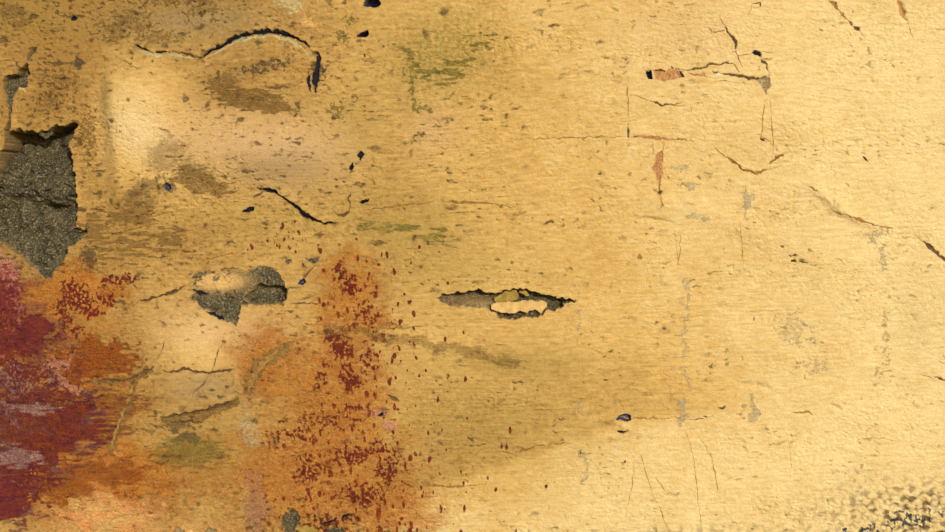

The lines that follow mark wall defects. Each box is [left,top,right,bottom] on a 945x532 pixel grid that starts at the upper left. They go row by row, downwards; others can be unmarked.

crack [136,28,321,93]
crack [508,18,784,175]
spalling [0,47,88,279]
crack [245,187,514,224]
crack [809,187,892,229]
spalling [189,257,326,326]
spalling [436,288,576,320]
corrosion [0,258,173,532]
crack [99,337,279,463]
corrosion [238,245,439,532]
spalling [281,508,345,532]